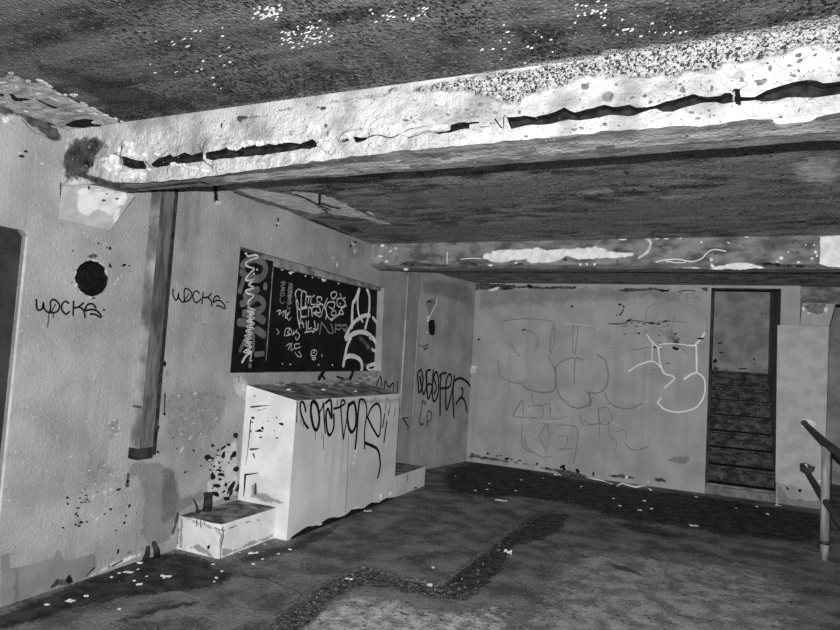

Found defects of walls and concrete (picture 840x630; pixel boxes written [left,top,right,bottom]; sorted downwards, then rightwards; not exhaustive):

peeling [0,72,124,130]
crack [114,80,840,171]
peeling [482,246,634,267]